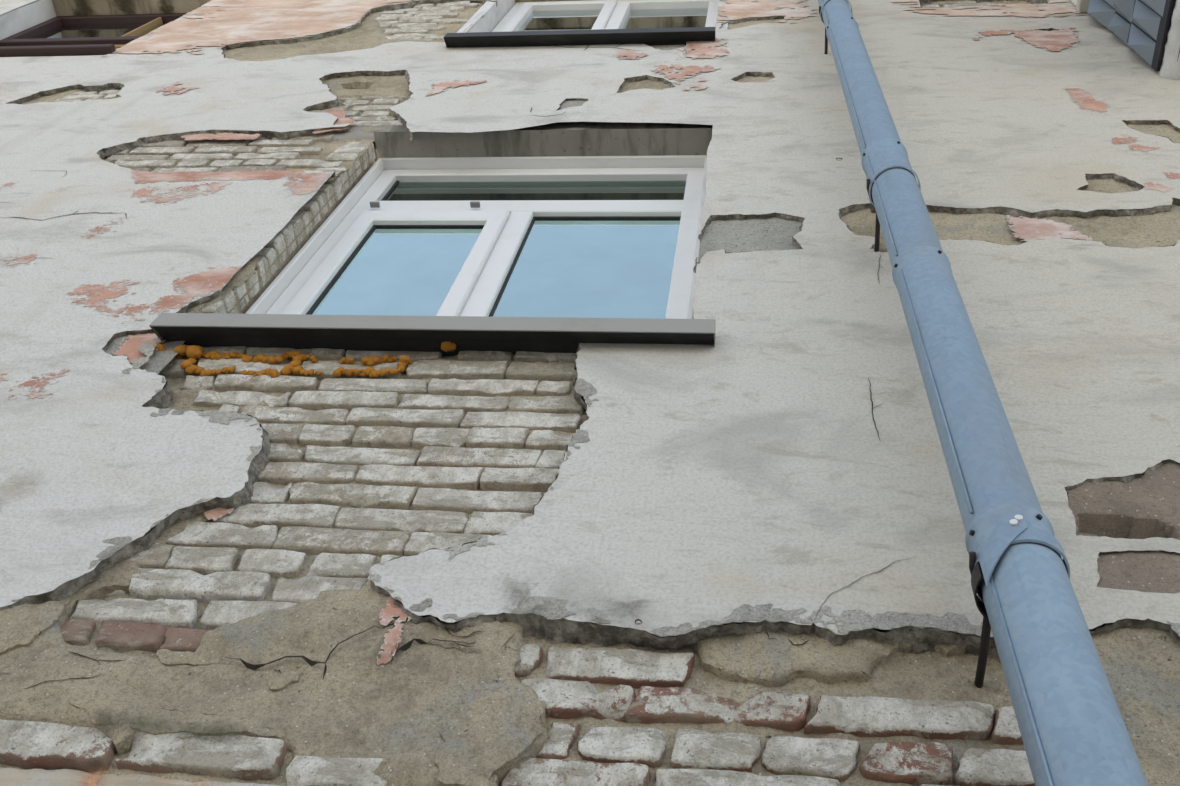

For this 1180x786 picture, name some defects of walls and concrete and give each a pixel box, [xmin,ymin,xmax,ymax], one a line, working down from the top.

peeling [101,0,497,61]
flaking render [5,83,124,104]
flaking render [97,70,487,205]
peeling [1,253,40,268]
flaking render [693,212,805,273]
flaking render [838,203,888,252]
flaking render [926,171,1180,248]
flaking render [0,259,1035,786]
flaking render [1064,459,1180,594]
crack [25,651,123,689]
crack [226,616,482,678]
flaking render [1089,618,1180,786]